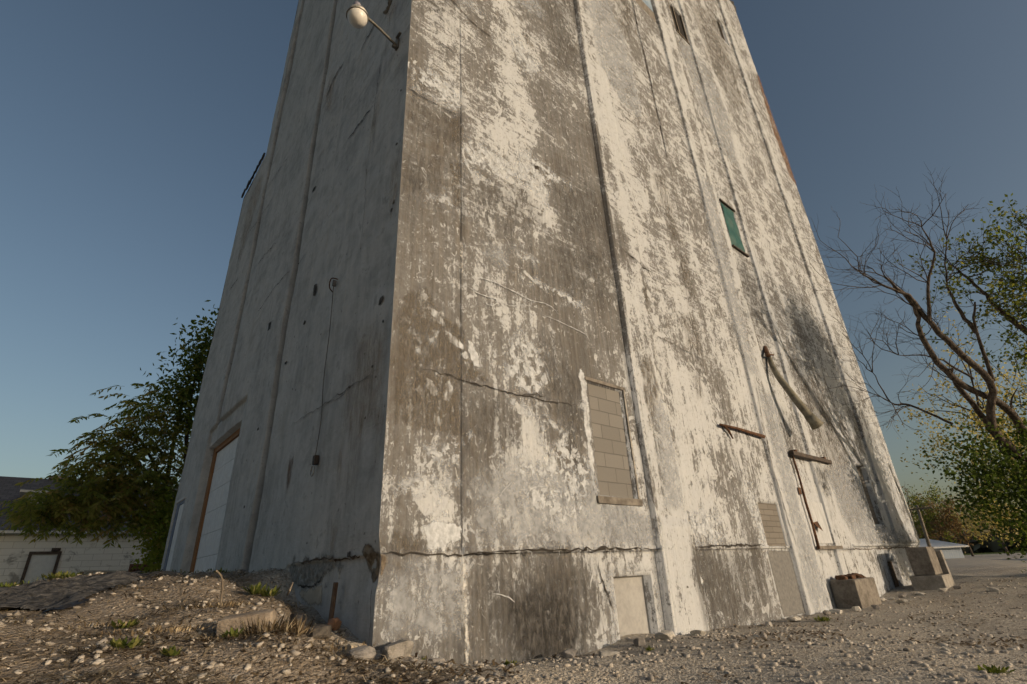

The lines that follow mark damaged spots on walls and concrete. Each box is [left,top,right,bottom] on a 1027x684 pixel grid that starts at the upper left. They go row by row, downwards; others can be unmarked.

peeling [413,68,571,210]
peeling [522,277,581,307]
crack [421,368,578,407]
peeling [641,357,658,415]
peeling [347,503,462,582]
crack [698,541,761,549]
crack [295,546,658,608]
water stain [510,583,578,657]